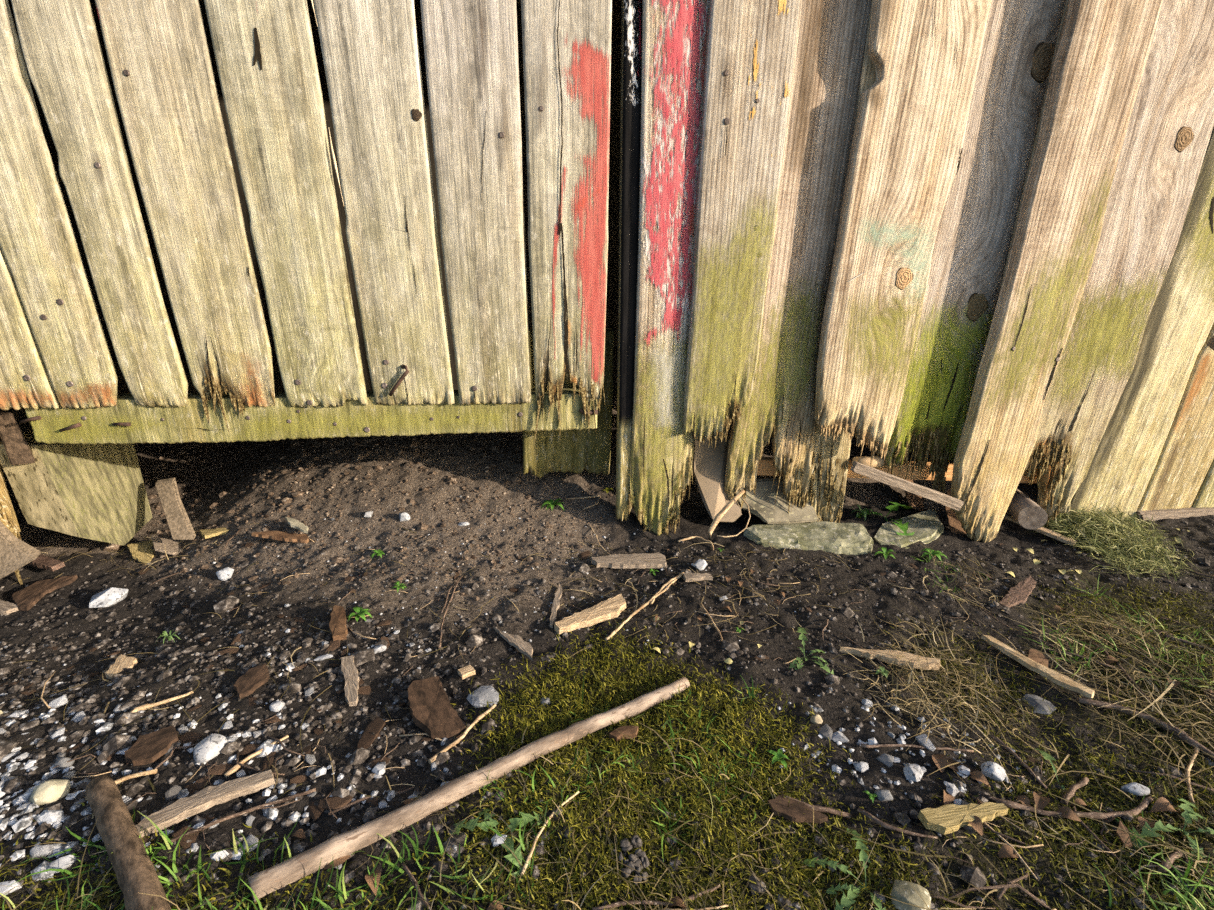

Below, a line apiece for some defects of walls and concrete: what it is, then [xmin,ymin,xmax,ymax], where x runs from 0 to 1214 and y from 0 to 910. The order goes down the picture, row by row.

peeling [552,0,708,424]
crack [1014,285,1032,347]
corrosion [0,386,113,406]
water stain [662,357,673,418]
crack [1044,348,1095,435]